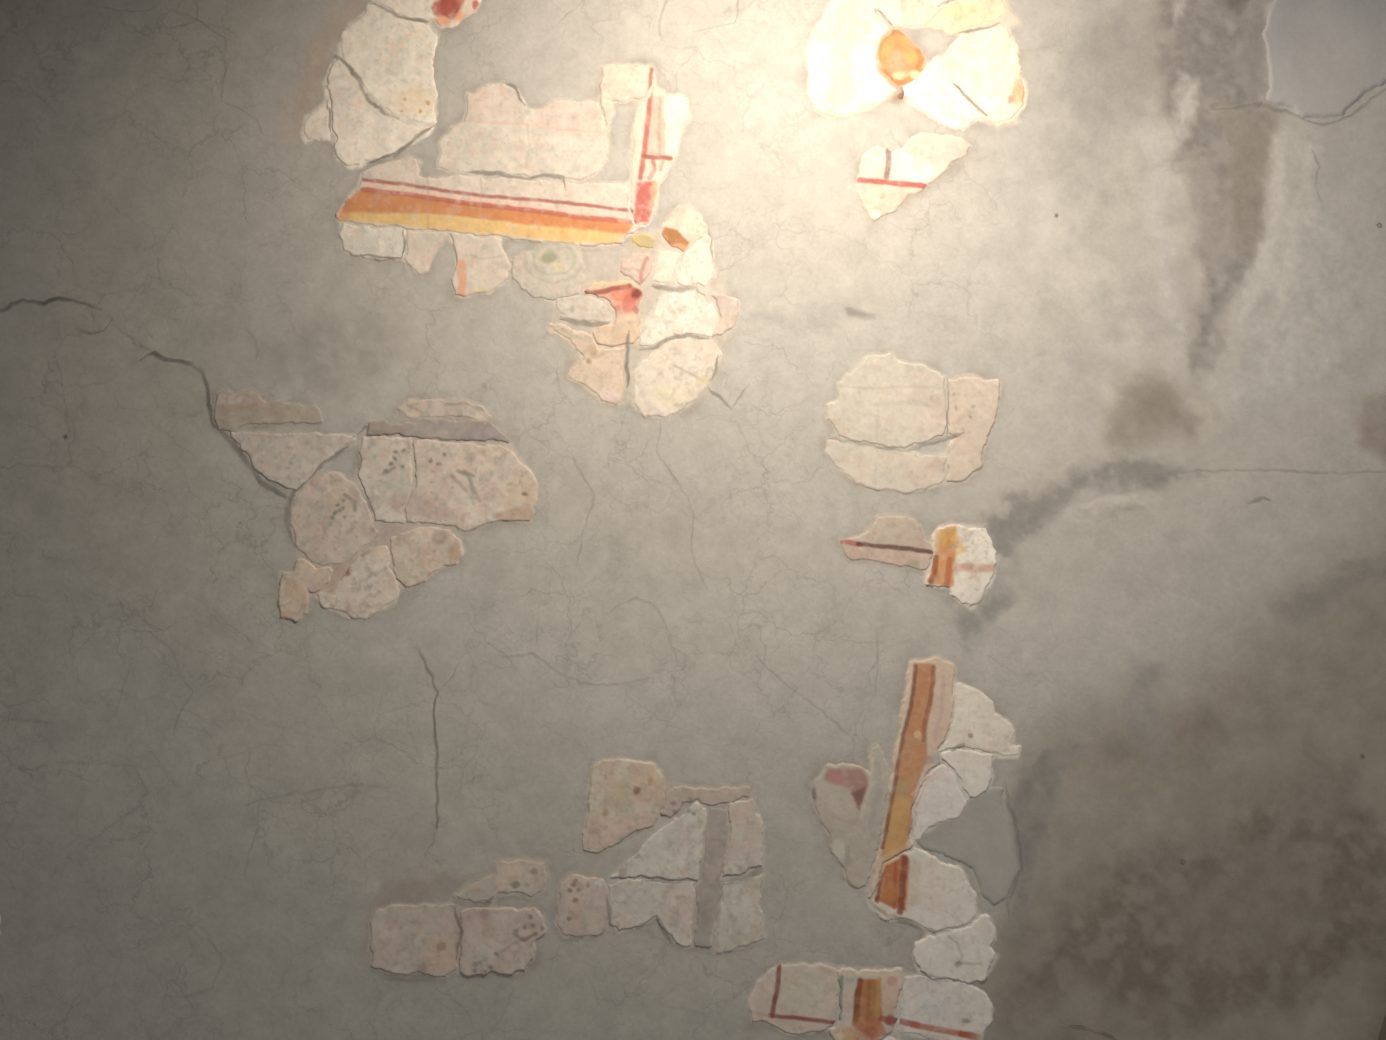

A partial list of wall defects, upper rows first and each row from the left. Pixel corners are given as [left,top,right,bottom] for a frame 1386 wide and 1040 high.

crack [0,296,95,333]
damp [987,0,1386,555]
crack [146,351,305,499]
damp [958,582,1010,638]
crack [420,652,439,828]
damp [1000,729,1386,1040]